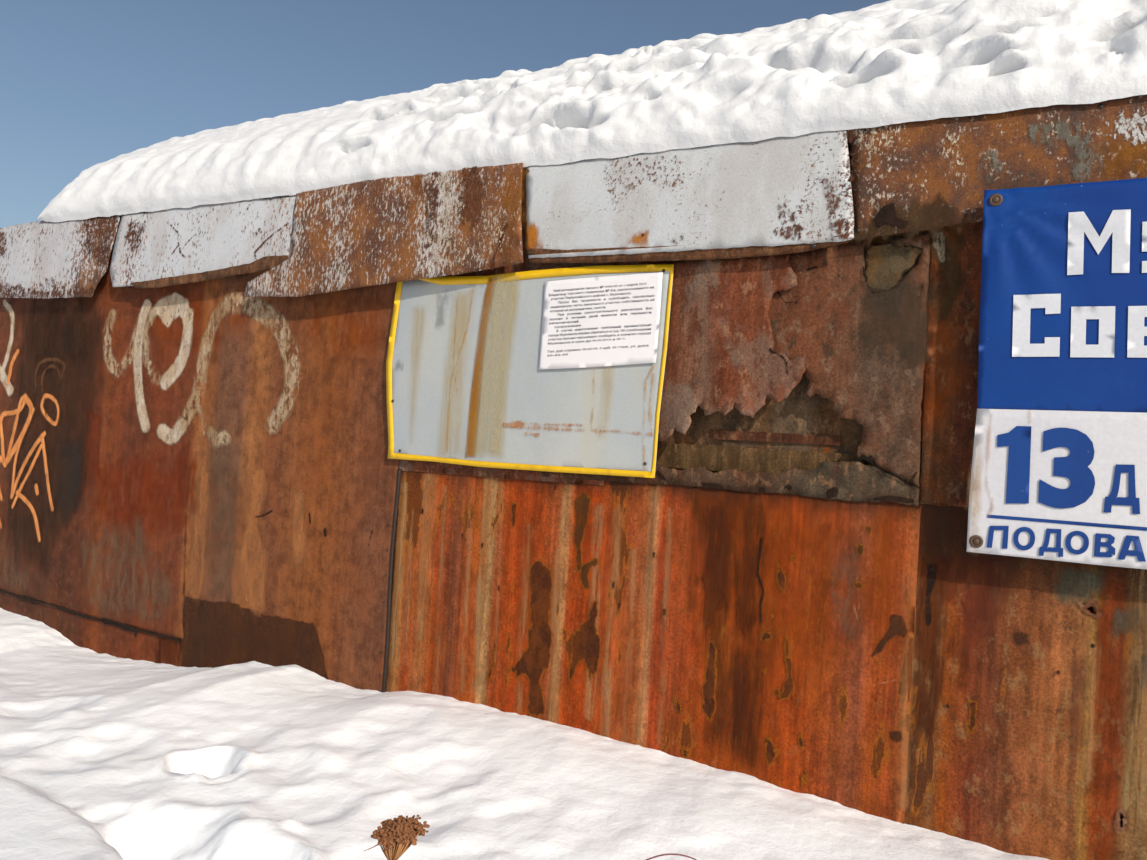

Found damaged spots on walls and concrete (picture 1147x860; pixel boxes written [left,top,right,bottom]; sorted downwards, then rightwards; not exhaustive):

corrosion [416,171,441,249]
corrosion [456,166,485,230]
corrosion [189,467,210,601]
corrosion [235,468,268,615]
corrosion [292,491,306,566]
corrosion [476,491,651,737]
corrosion [694,487,797,722]
corrosion [733,652,776,766]
corrosion [871,556,945,739]
corrosion [1014,632,1028,645]
corrosion [1125,668,1147,817]